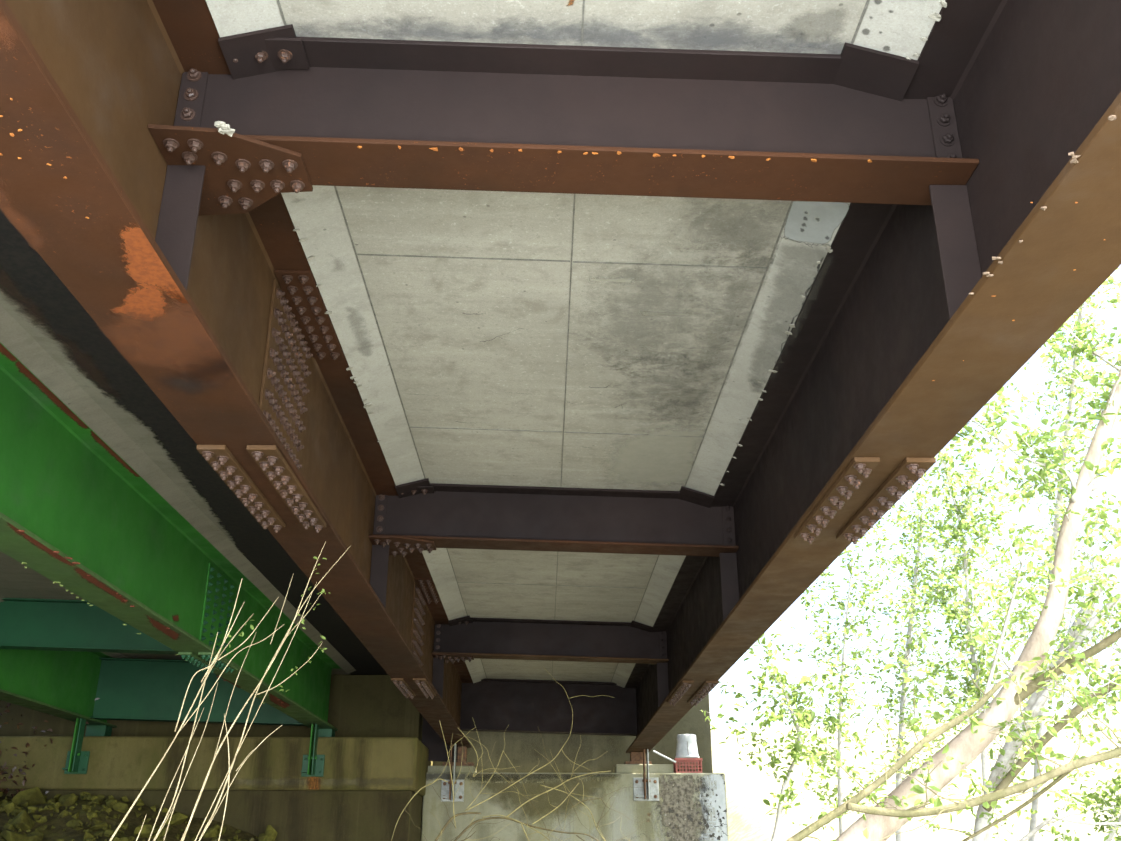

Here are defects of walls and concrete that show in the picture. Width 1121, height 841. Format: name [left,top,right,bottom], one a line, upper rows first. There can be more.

damp [379,25,842,54]
rust [110,223,188,322]
damp [0,208,388,675]
damp [700,774,728,841]